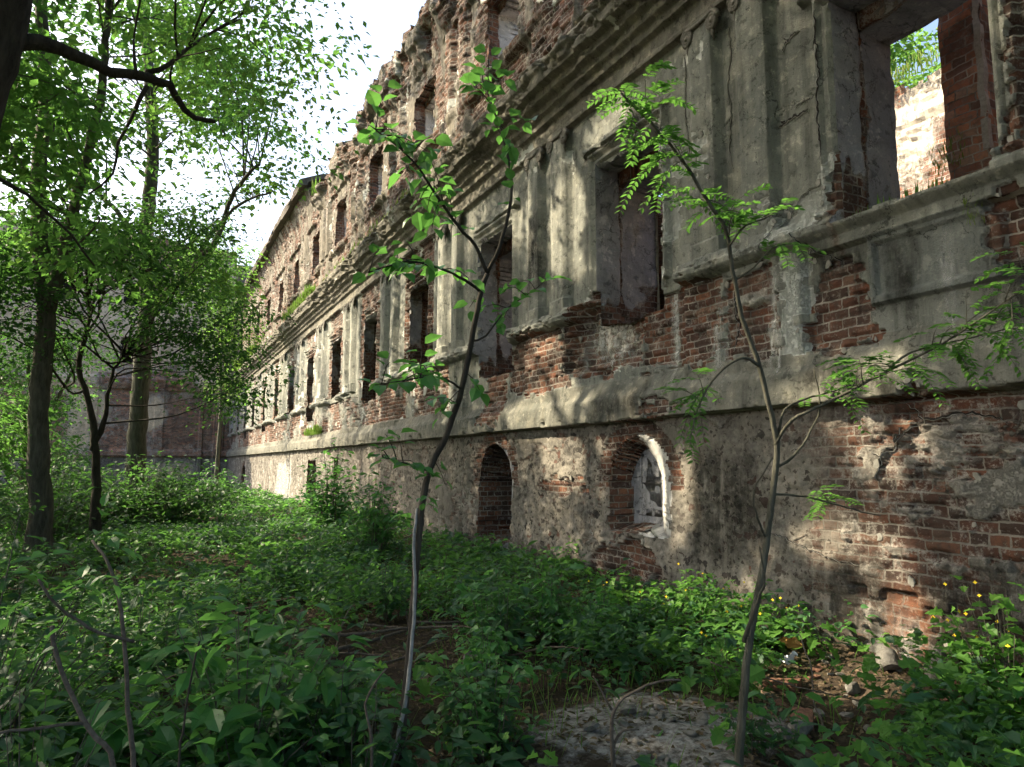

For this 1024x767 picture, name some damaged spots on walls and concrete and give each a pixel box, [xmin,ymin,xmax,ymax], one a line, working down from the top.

crack [724,26,733,172]
crack [758,9,844,267]
flaking render [642,149,886,374]
flaking render [472,317,586,430]
flaking render [634,394,683,422]
crack [872,403,1007,480]
flaking render [866,394,1024,673]